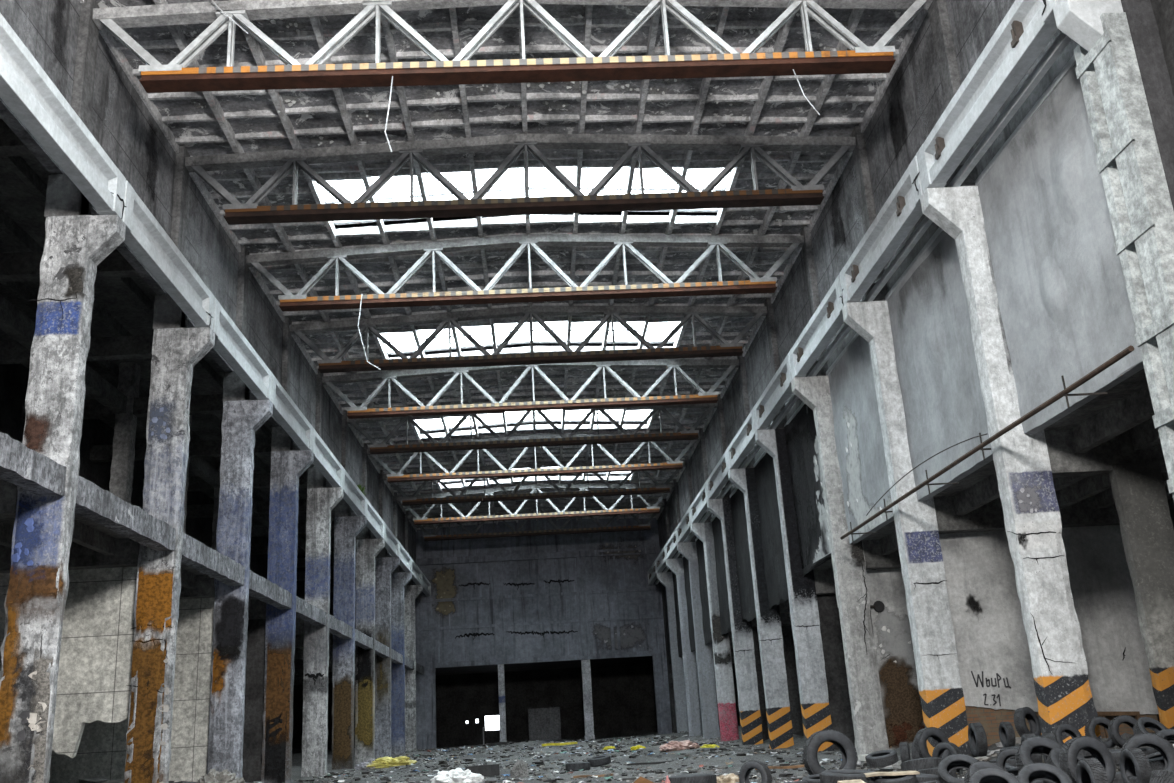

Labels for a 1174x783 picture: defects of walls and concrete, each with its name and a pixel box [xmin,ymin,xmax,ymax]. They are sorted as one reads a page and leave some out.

peeling [12,493,43,580]
spalling [12,649,54,783]
spalling [158,687,170,746]
spalling [874,607,925,748]